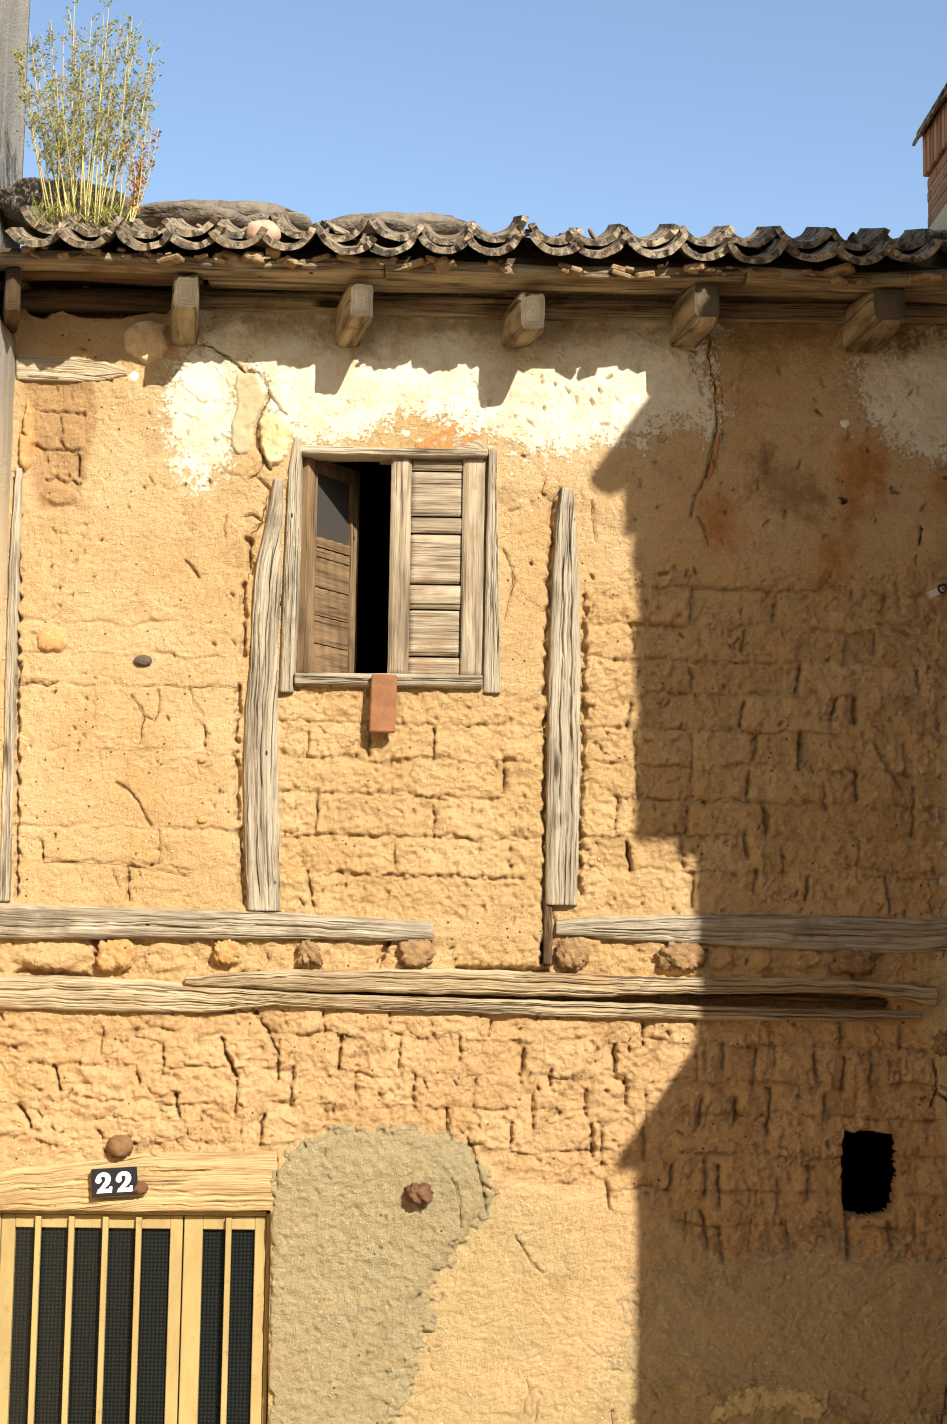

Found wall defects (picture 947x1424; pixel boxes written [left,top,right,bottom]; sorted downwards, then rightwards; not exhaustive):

peeling [128,310,749,508]
crack [690,337,718,542]
crack [132,684,239,744]
crack [45,783,186,901]